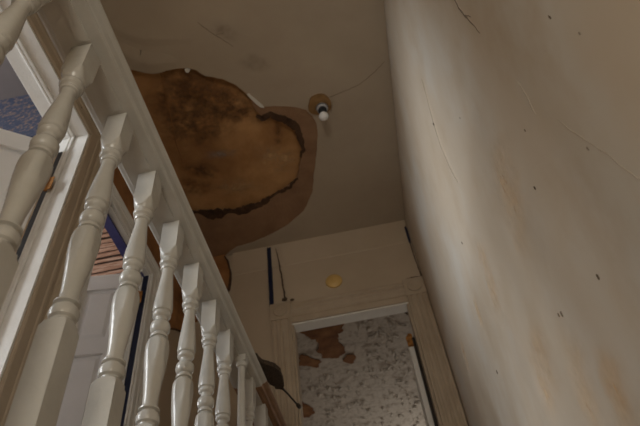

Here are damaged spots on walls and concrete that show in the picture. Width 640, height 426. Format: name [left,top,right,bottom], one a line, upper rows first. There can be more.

spalling [113,167,135,220]
spalling [131,68,318,293]
crack [276,250,294,301]
spalling [168,274,184,332]
peeling [299,324,356,368]